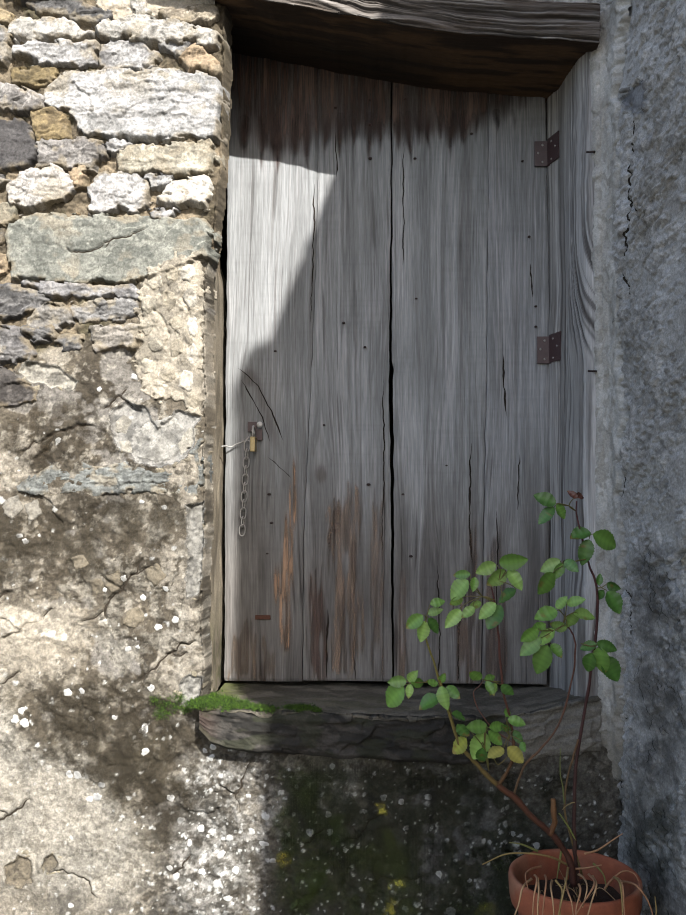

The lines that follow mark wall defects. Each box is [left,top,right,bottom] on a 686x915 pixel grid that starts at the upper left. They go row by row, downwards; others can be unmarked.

crack [84,562,147,621]
crack [138,642,193,682]
water stain [43,692,196,844]
crack [0,799,28,821]
spalling [4,850,62,889]
water stain [432,850,516,915]